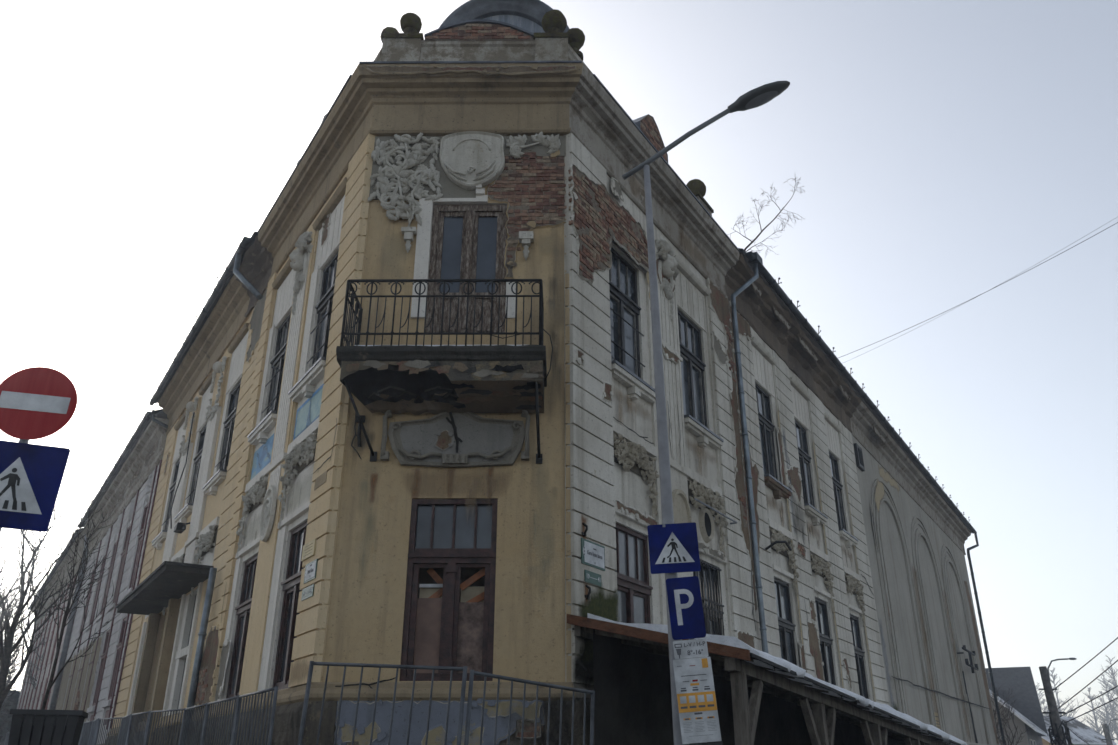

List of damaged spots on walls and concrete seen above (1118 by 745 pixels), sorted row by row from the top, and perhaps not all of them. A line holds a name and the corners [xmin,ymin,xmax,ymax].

flaking render [486,149,676,300]
spalling [346,360,545,410]
peeling [707,278,761,620]
peeling [776,410,825,681]
peeling [334,698,545,745]